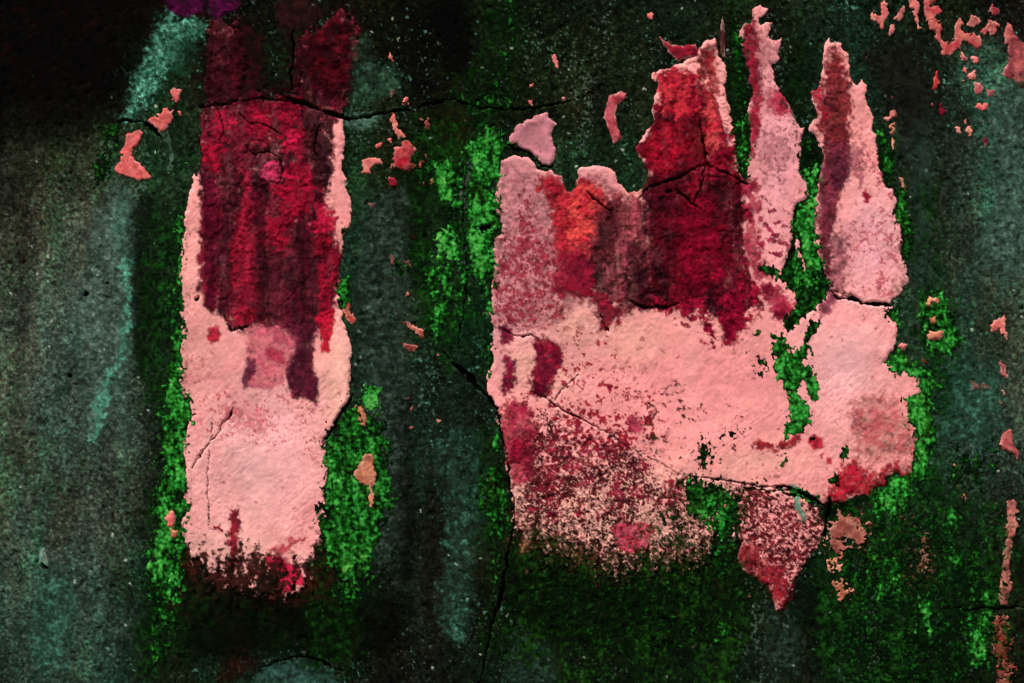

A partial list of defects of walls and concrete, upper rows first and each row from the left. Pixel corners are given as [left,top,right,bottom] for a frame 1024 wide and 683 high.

peeling [115,88,182,181]
peeling [317,100,352,254]
crack [199,37,585,179]
crack [641,135,748,208]
peeling [871,0,1024,122]
peeling [164,173,367,600]
crack [445,264,515,682]
crack [541,375,649,458]
peeling [479,5,921,611]
leakage [494,19,914,683]
crack [707,477,831,541]
leakage [171,509,413,683]